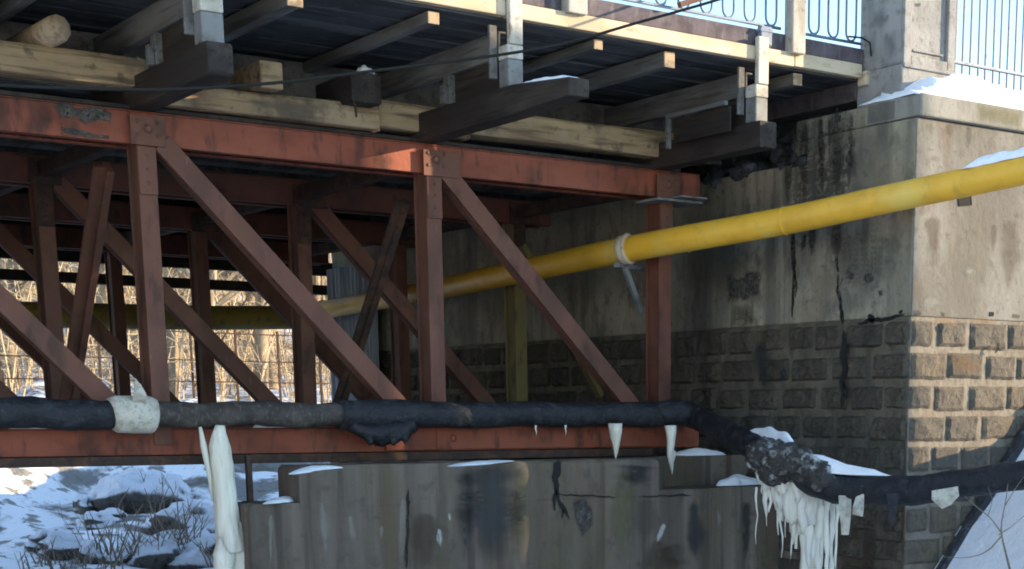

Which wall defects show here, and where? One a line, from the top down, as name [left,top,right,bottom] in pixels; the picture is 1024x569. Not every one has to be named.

damp [786,110,862,204]
crack [790,233,798,315]
damp [801,229,815,252]
crack [835,257,903,407]
damp [448,468,512,547]
crack [552,460,569,519]